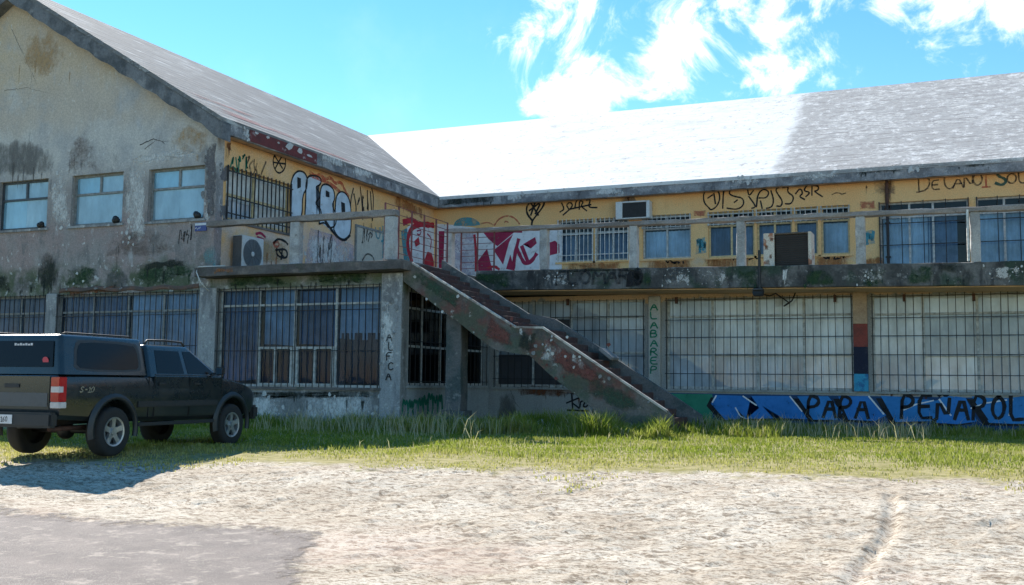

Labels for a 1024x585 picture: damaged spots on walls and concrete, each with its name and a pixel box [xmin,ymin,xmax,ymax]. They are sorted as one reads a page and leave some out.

leakage [0,143,46,188]
mould [0,257,61,303]
leakage [124,234,191,287]